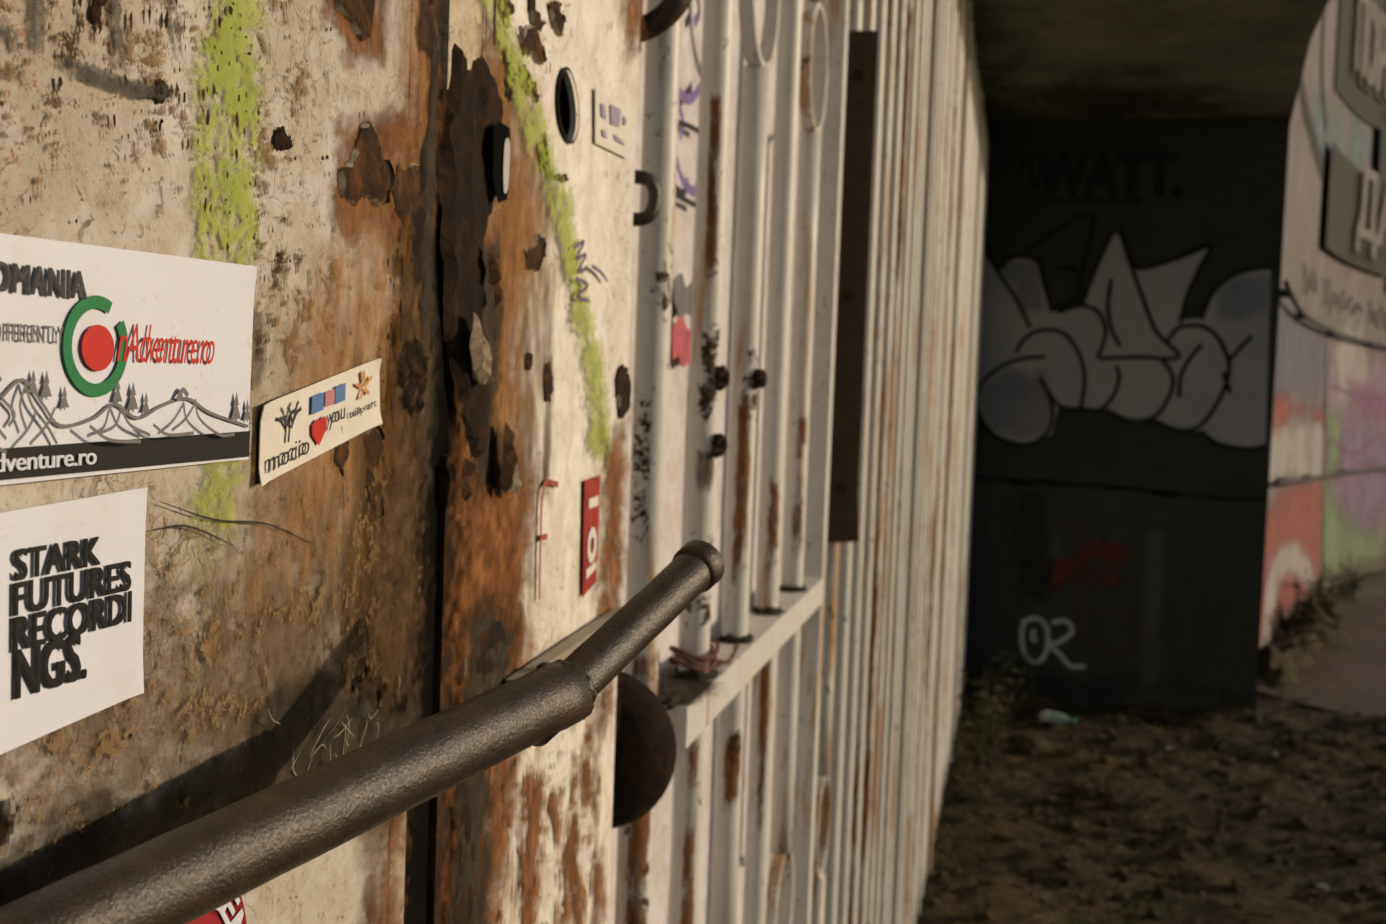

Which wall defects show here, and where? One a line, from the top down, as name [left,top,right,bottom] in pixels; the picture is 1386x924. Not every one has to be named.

corrosion [732,347,758,583]
corrosion [625,811,651,924]